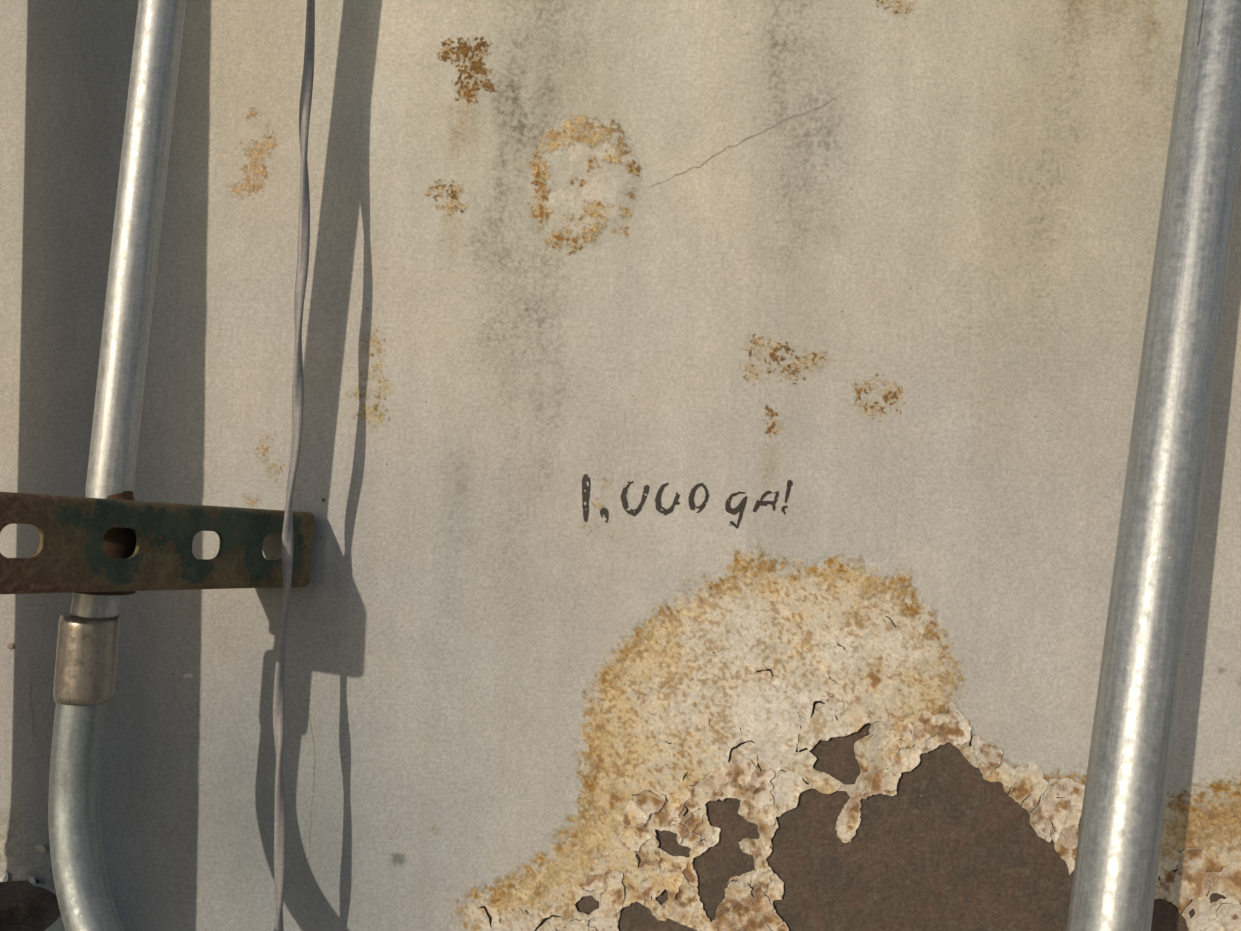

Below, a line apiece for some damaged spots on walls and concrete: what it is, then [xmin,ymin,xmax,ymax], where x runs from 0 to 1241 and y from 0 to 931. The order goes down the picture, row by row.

corrosion [437,37,495,102]
corrosion [232,136,276,195]
corrosion [427,179,466,215]
corrosion [527,115,641,254]
crack [648,92,845,187]
corrosion [743,334,825,384]
corrosion [765,405,781,436]
corrosion [855,374,903,419]
peeling [372,534,1090,931]
peeling [1151,753,1241,931]